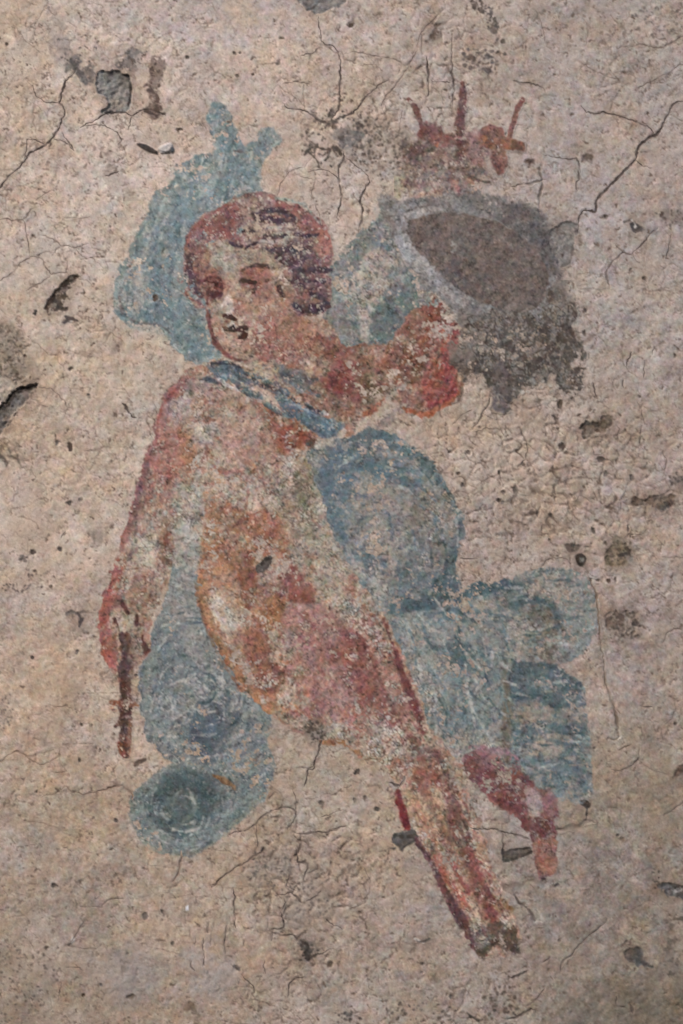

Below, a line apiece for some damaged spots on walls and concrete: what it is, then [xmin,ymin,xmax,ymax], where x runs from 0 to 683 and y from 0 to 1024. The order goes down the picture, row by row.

crack [0,67,166,189]
flaking render [63,44,168,121]
crack [277,151,371,234]
crack [282,10,456,140]
crack [513,80,544,89]
crack [511,100,683,234]
flaking render [32,273,81,325]
flaking render [0,322,39,437]